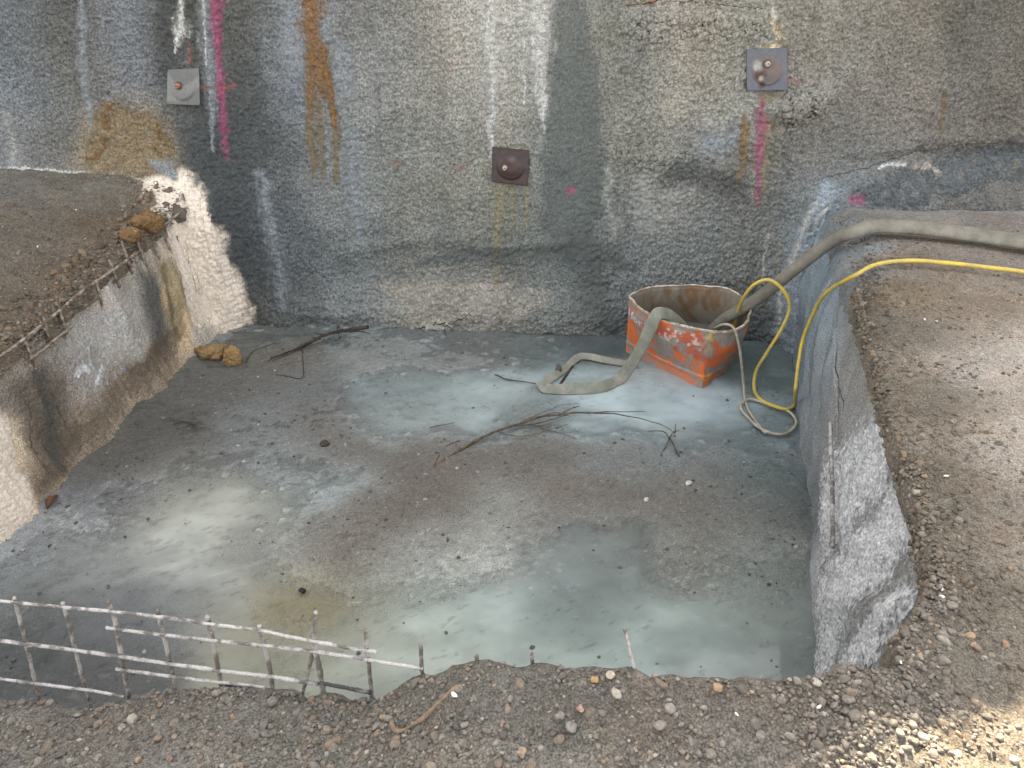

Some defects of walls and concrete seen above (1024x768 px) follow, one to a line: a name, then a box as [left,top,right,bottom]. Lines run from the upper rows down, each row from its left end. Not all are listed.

rust [299,0,340,184]
crack [806,142,1021,183]
spalling [0,193,188,391]
crack [834,343,844,420]